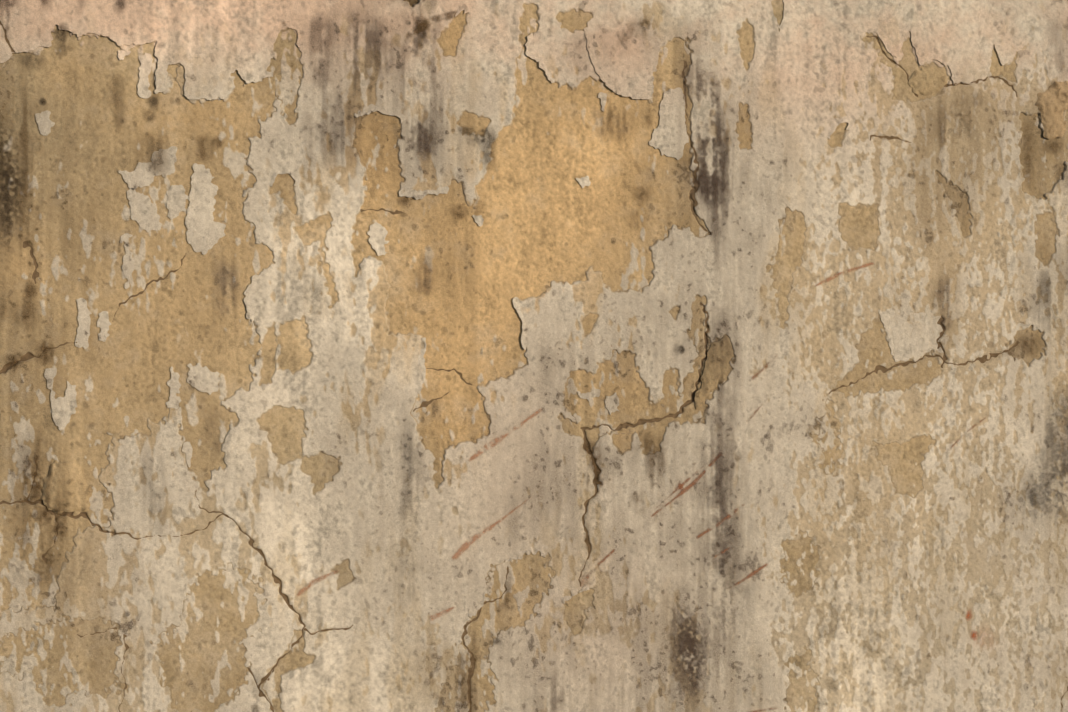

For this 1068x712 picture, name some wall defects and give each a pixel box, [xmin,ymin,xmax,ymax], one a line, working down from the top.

water stain [0,170,23,228]
peeling [352,1,734,488]
crack [870,135,911,143]
crack [944,76,1017,97]
spalling [1019,111,1068,265]
peeling [0,22,339,712]
crack [829,316,1019,394]
crack [578,302,709,587]
crack [0,456,353,712]
crack [462,566,509,712]
peeling [435,544,594,712]
water stain [672,619,700,694]